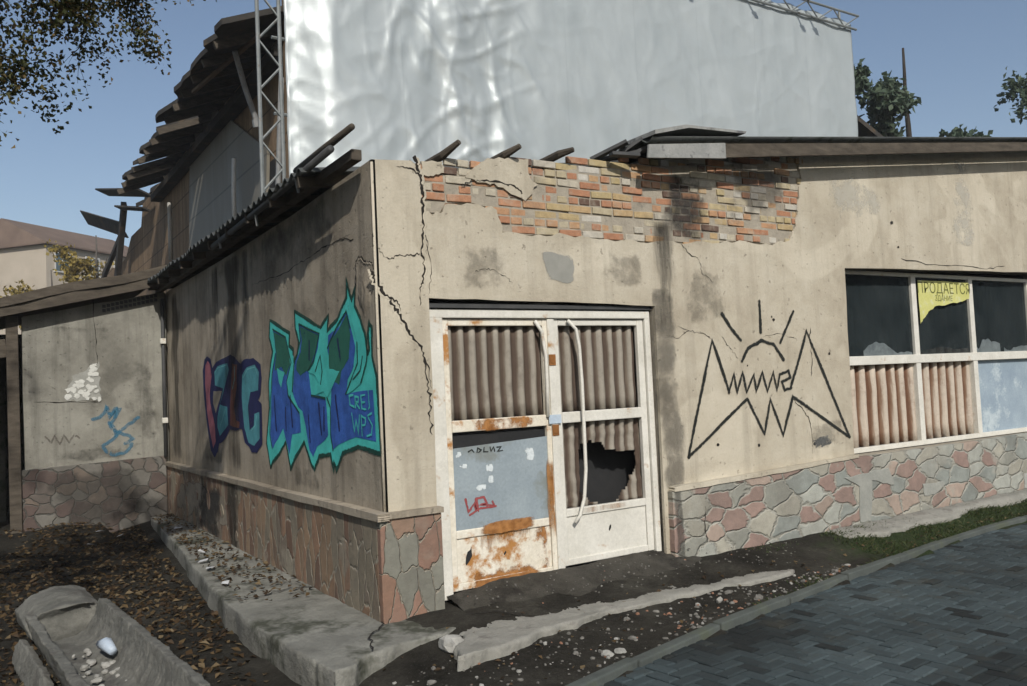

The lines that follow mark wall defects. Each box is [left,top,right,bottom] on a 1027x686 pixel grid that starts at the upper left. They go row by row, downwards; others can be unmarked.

crack [462,179,522,194]
flaking render [419,156,803,244]
leakage [658,223,670,269]
crack [257,155,434,436]
leakage [172,296,181,445]
leakage [212,258,246,460]
corrosion [476,417,532,431]
leakage [227,484,236,547]
corrosion [483,463,556,547]
corrosion [475,560,548,588]